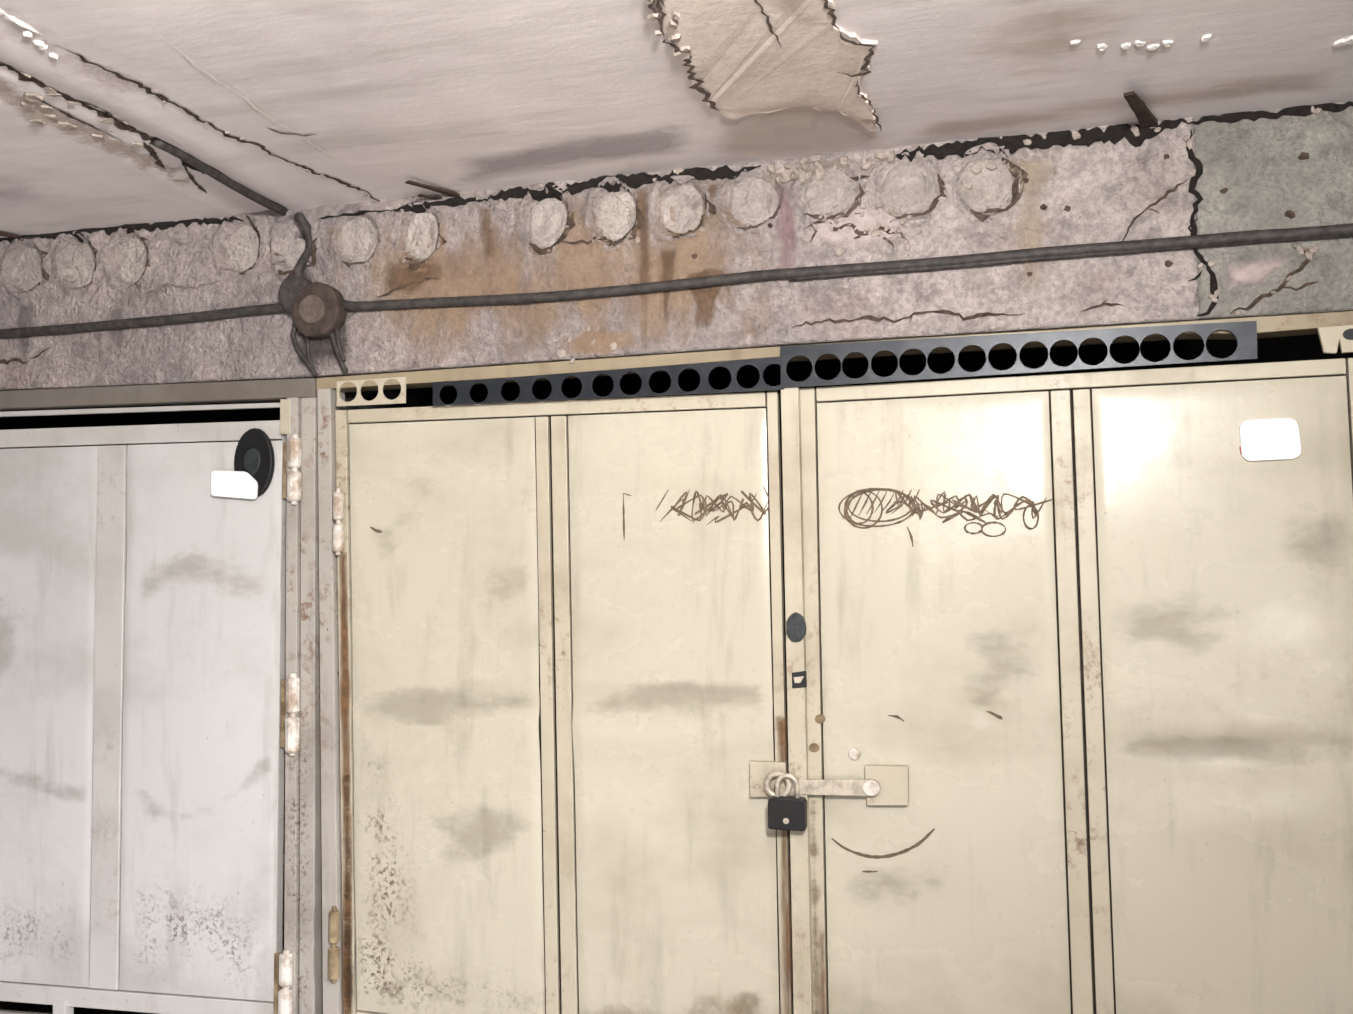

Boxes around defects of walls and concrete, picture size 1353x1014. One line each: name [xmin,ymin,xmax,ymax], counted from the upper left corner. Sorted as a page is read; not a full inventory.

flaking render [646,0,882,135]
crack [45,32,761,219]
crack [0,61,286,269]
flaking render [762,150,896,188]
crack [557,236,642,245]
flaking render [802,202,912,257]
crack [803,101,1353,316]
crack [145,280,220,294]
crack [376,270,440,298]
flaking render [1231,261,1280,282]